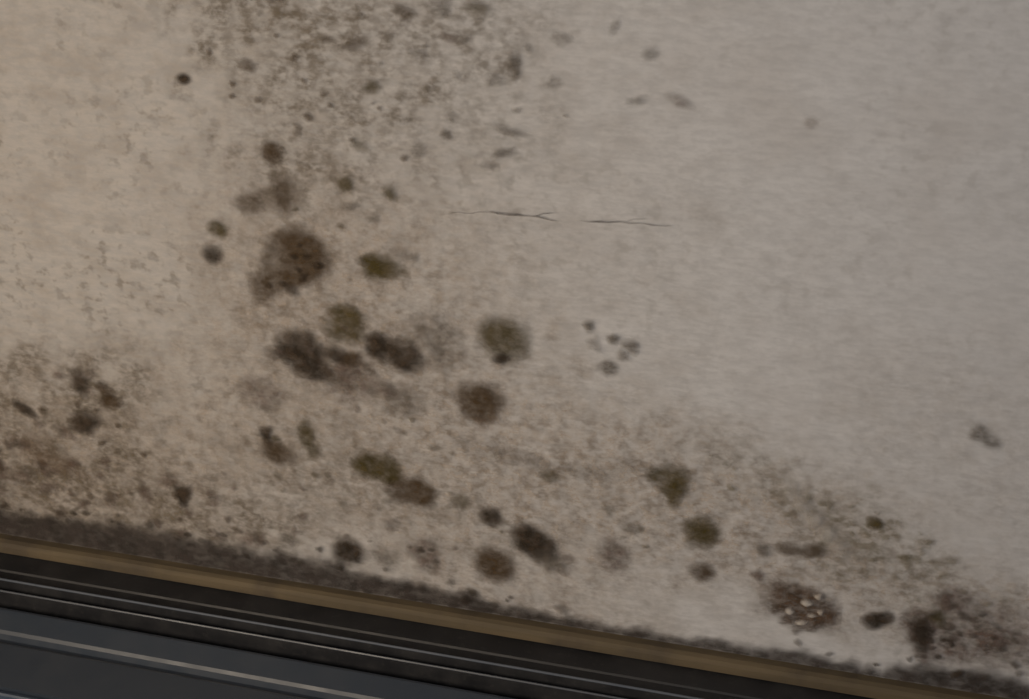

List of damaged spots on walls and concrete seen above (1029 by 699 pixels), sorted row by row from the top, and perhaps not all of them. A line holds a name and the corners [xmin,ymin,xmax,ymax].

damp [271,0,359,64]
damp [263,143,280,162]
damp [210,223,225,236]
damp [205,249,220,262]
damp [254,230,422,392]
damp [482,322,523,363]
damp [0,374,1029,699]